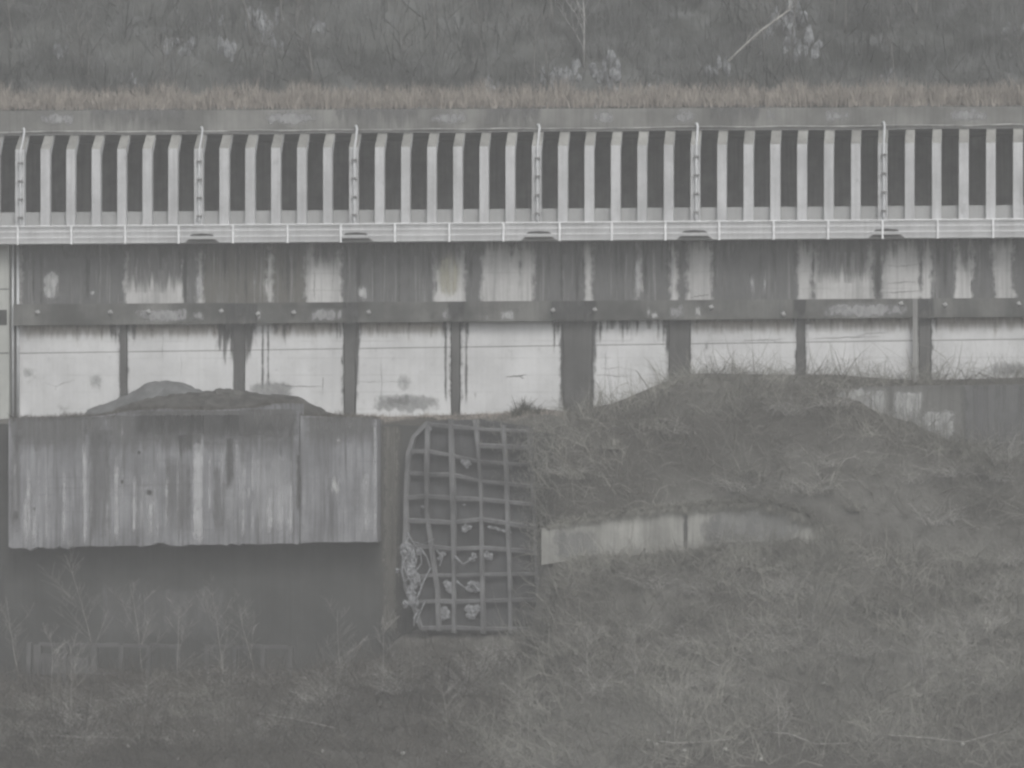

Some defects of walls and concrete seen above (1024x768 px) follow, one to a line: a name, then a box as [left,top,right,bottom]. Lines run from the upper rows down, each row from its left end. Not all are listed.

water stain [20,238,1024,405]
water stain [14,409,294,537]